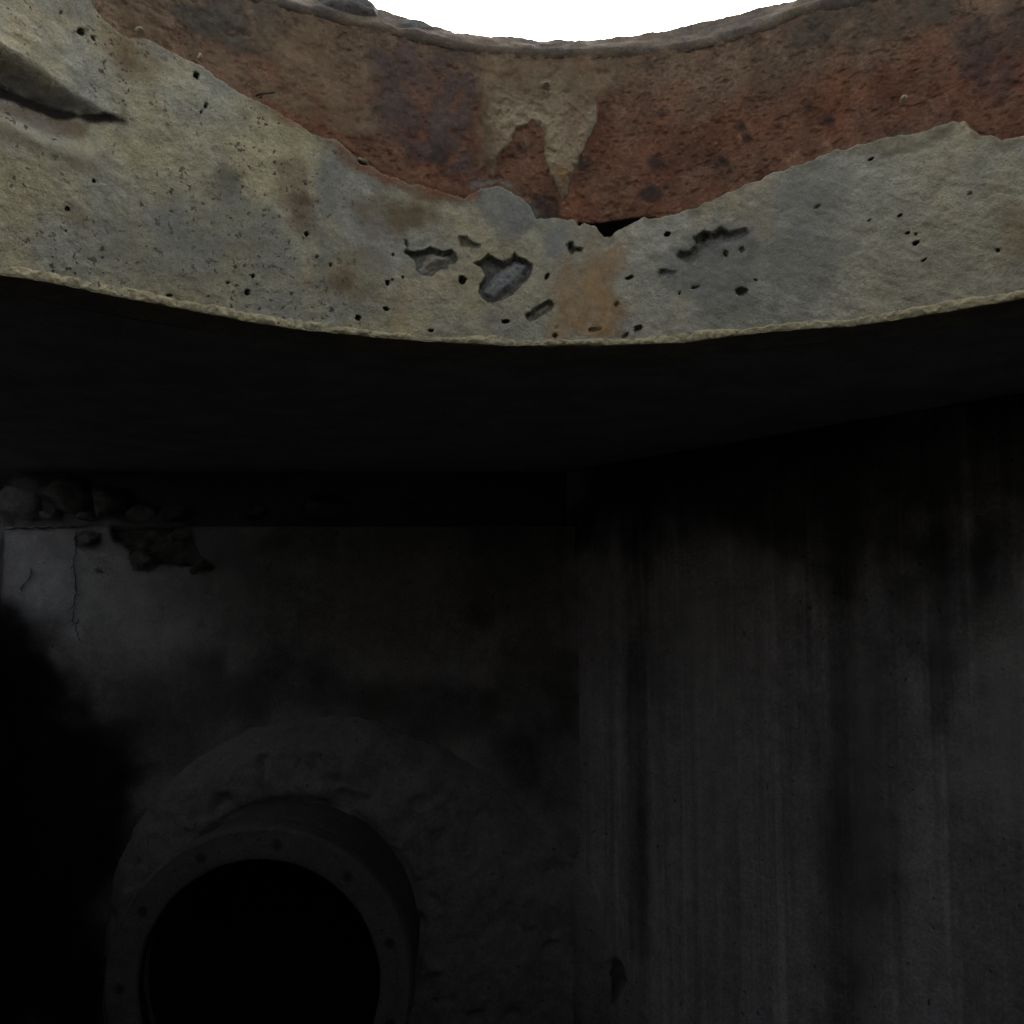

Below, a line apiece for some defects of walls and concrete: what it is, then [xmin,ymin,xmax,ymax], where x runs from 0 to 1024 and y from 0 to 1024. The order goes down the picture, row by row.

hole [405,235,532,303]
hole [658,227,749,277]
crack [3,526,99,641]